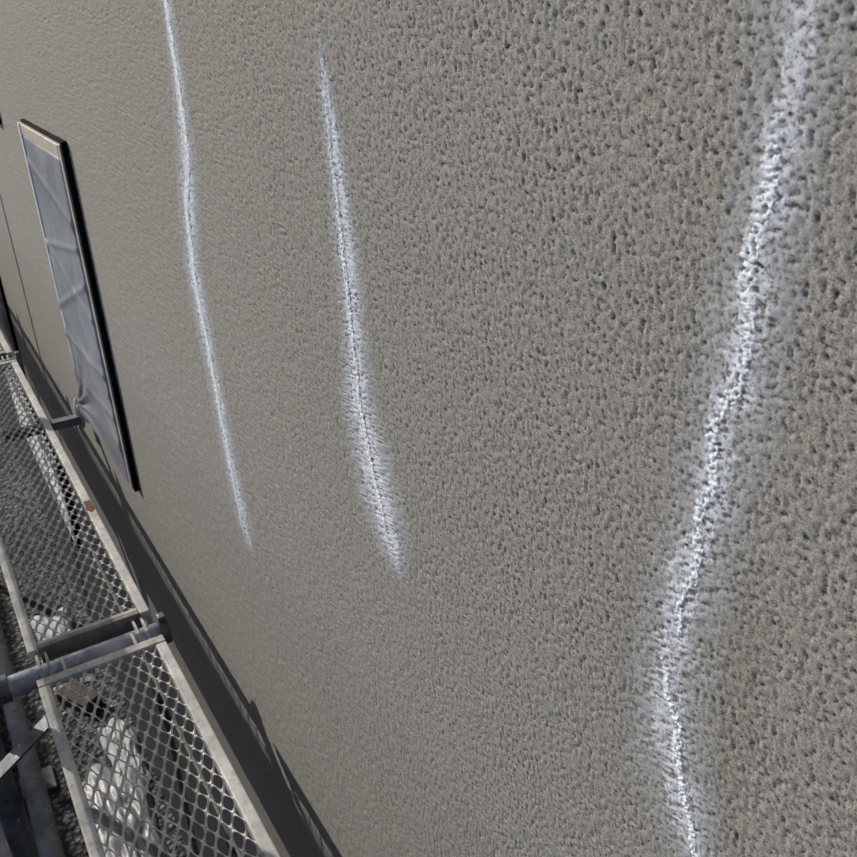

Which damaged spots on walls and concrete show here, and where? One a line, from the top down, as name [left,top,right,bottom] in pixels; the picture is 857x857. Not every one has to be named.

crack [162,0,251,548]
crack [320,54,401,574]
crack [647,0,824,857]